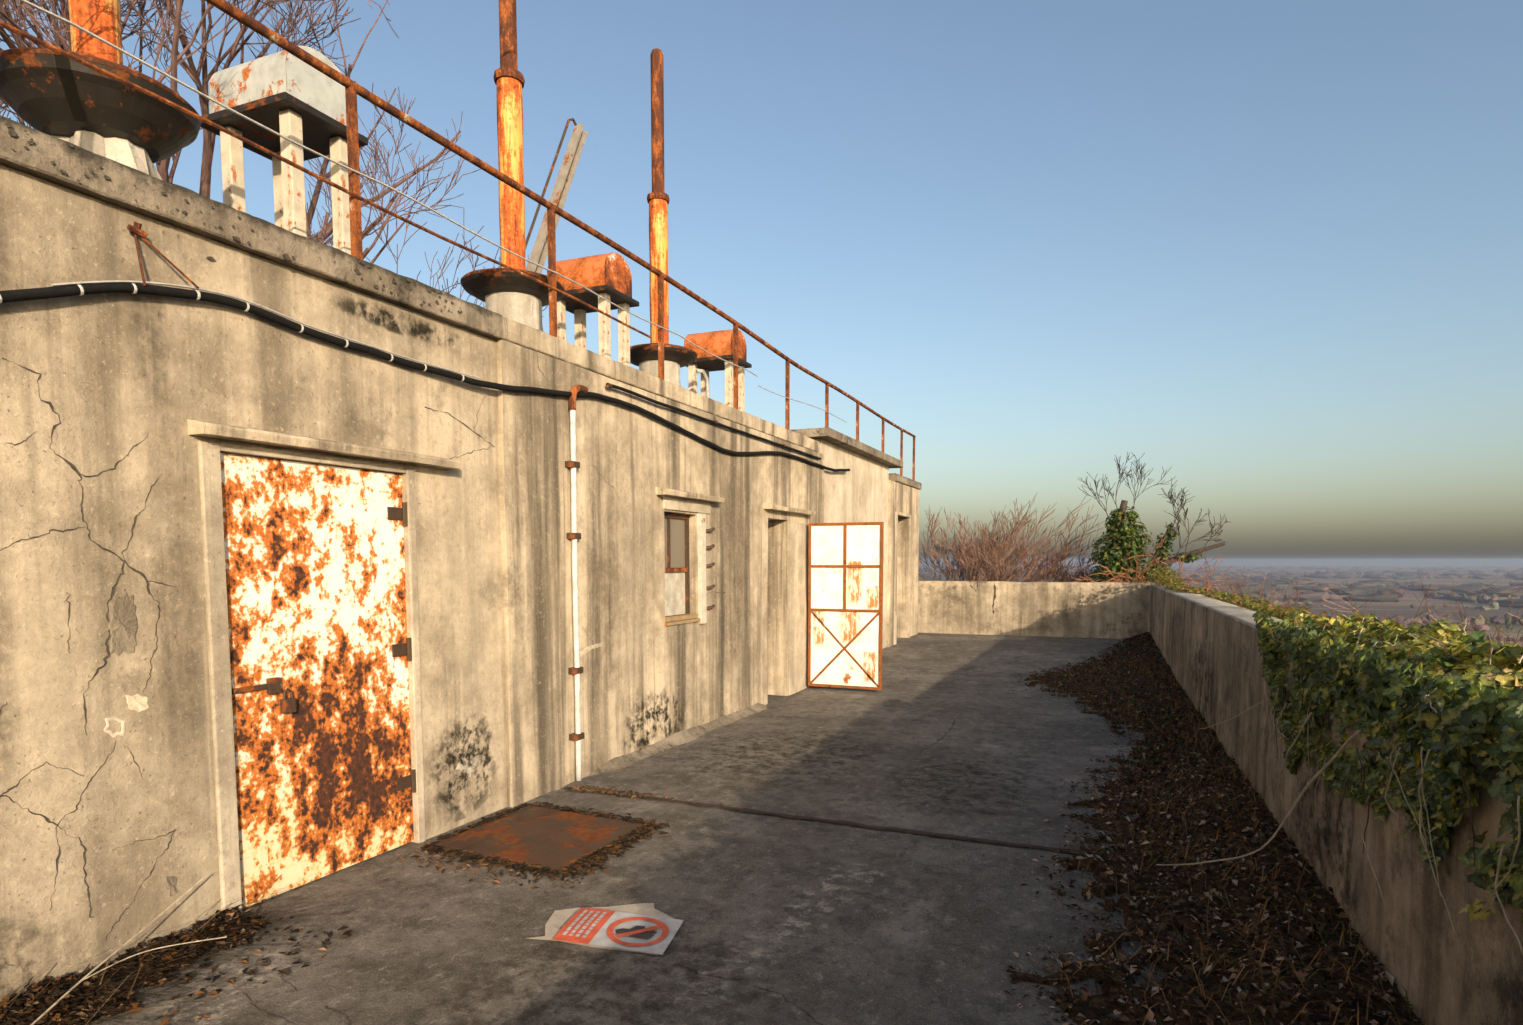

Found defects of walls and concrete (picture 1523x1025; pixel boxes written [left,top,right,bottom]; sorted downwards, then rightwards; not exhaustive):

rust [843,561,878,641]
crack [0,357,177,938]
rust [864,651,875,680]
water stain [625,696,680,750]
water stain [437,721,491,811]